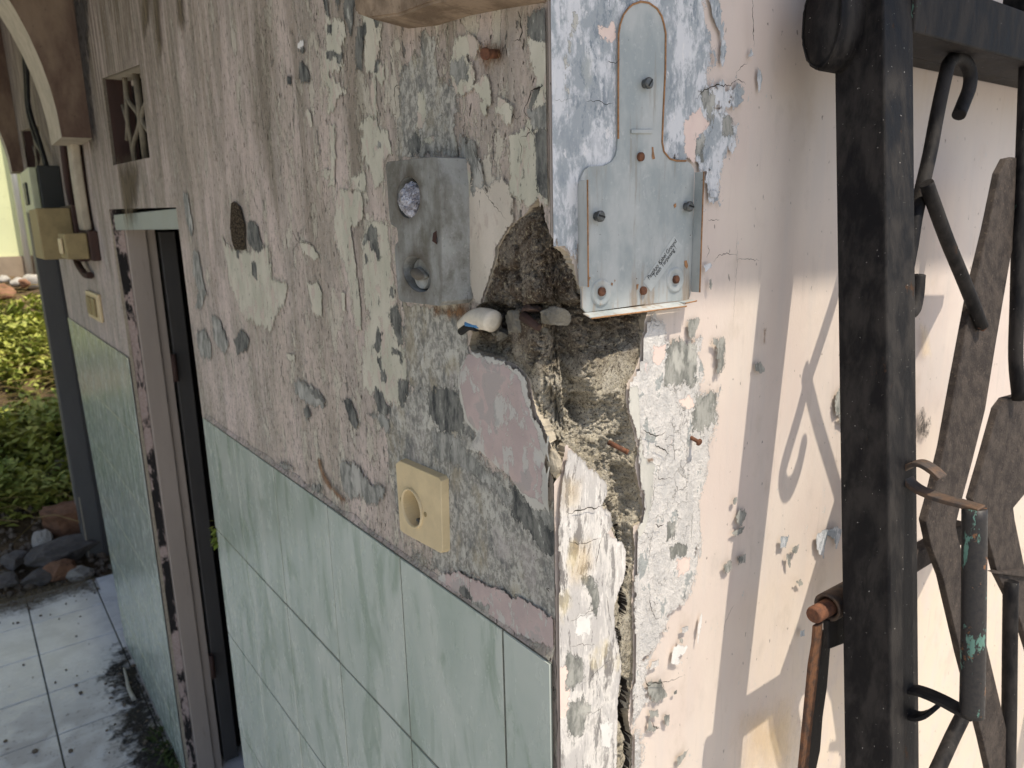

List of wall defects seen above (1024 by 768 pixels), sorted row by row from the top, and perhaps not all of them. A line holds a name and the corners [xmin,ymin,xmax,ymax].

peeling [192,202,287,360]
spalling [286,0,746,768]
crack [569,430,684,768]
peeling [780,535,799,568]
peeling [816,526,842,558]